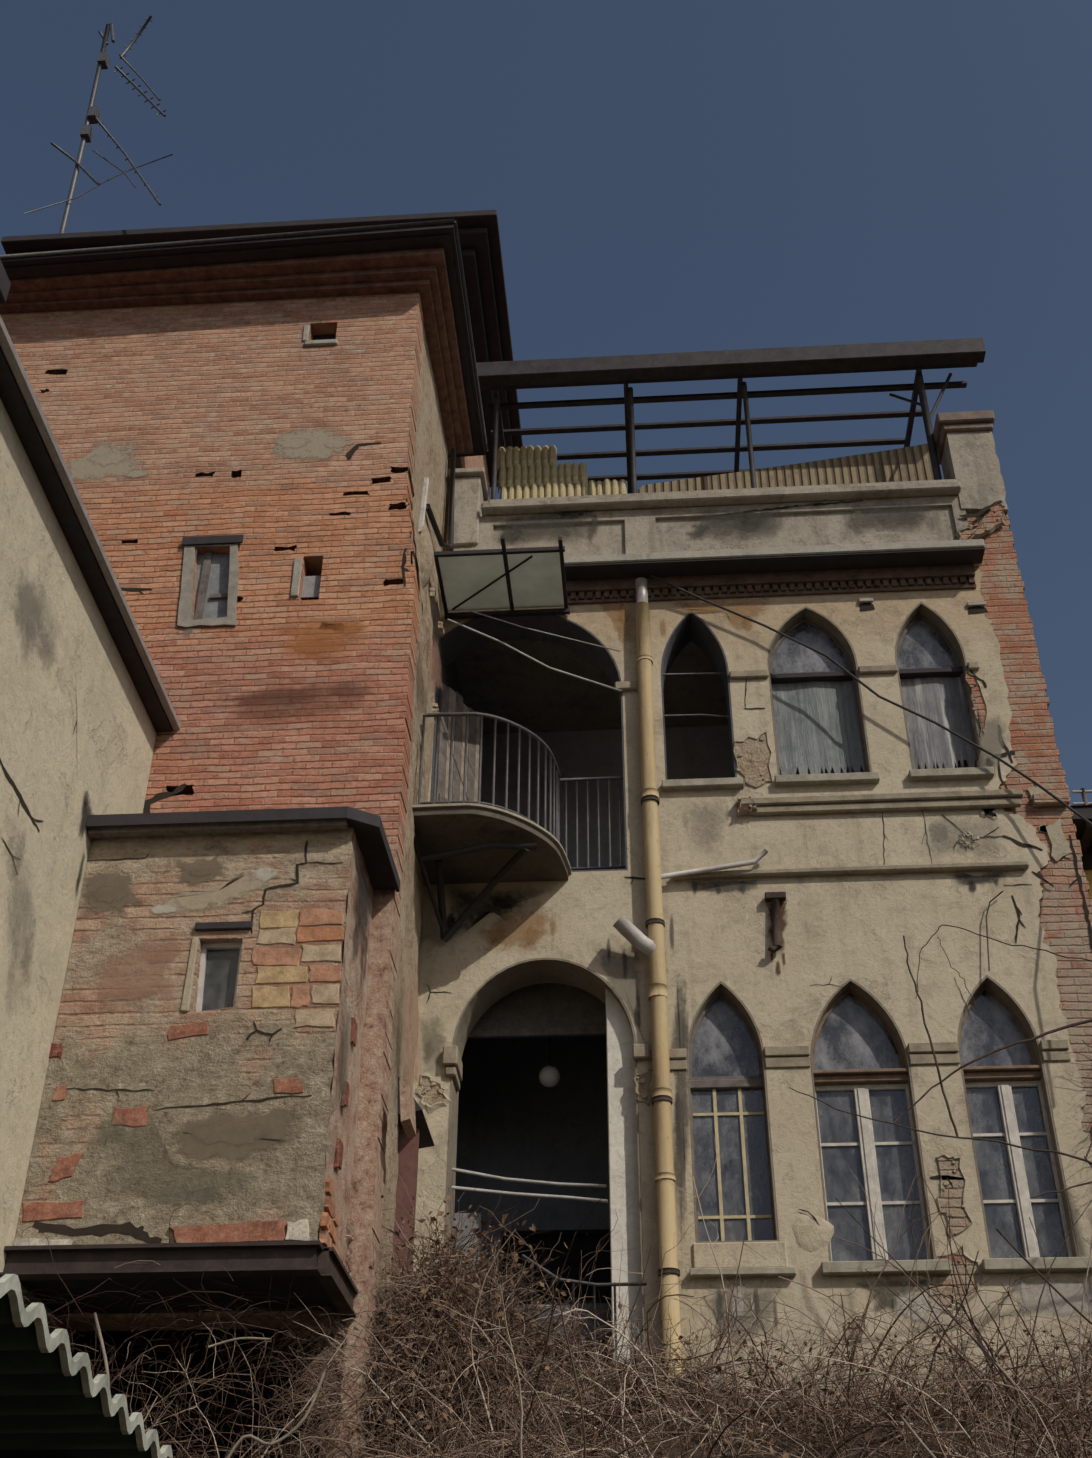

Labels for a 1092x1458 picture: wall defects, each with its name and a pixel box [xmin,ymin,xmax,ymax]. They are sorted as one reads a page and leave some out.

spalling [956,501,1006,540]
spalling [967,601,988,614]
spalling [965,671,988,738]
crack [0,759,44,875]
crack [242,840,343,933]
spalling [733,732,773,818]
crack [882,811,1092,949]
flaking render [1038,818,1071,862]
spalling [251,908,358,1047]
crack [66,1087,312,1111]
crack [33,1221,162,1243]
spalling [924,1153,983,1315]